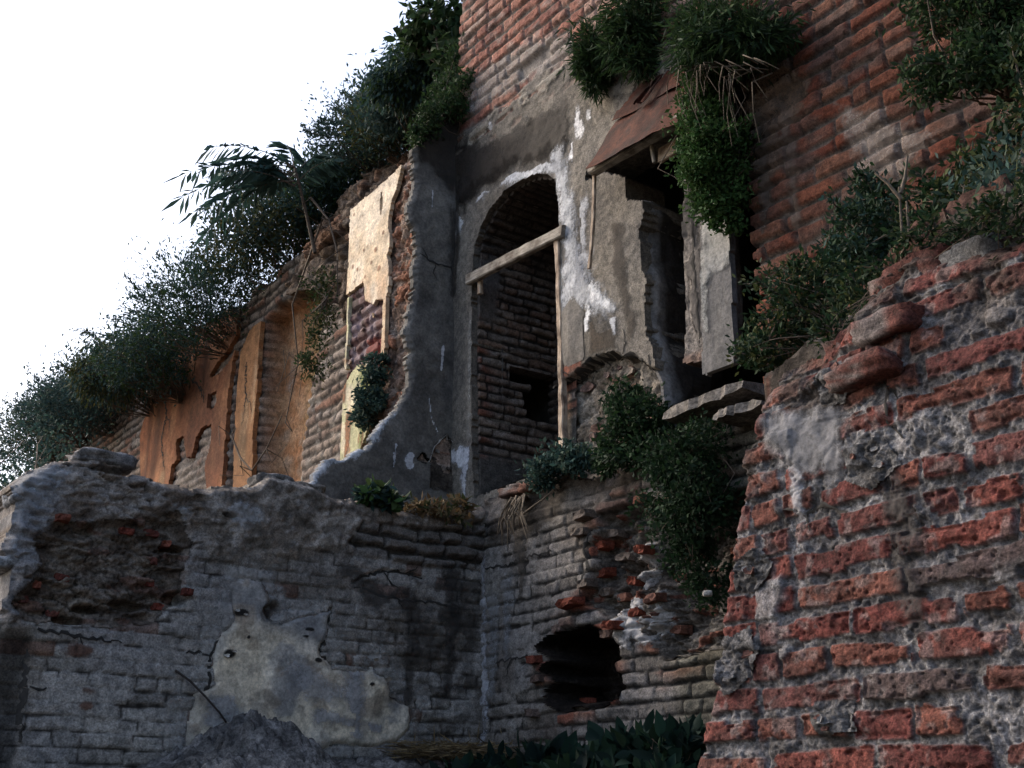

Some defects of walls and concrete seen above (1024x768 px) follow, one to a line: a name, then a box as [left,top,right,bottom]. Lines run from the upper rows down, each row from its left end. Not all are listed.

leakage [418,37,634,354]
crack [420,246,452,279]
spalling [173,428,211,490]
spalling [11,510,194,628]
crack [354,567,470,610]
spalling [555,504,773,695]
crack [15,627,122,743]
peeling [185,578,410,749]